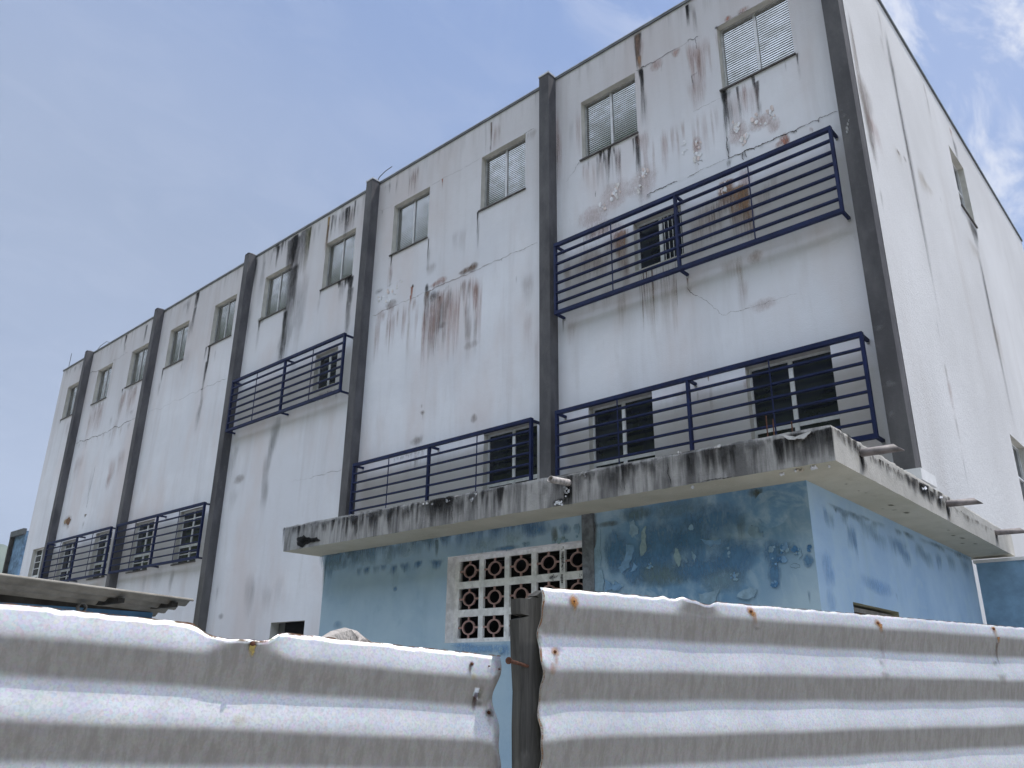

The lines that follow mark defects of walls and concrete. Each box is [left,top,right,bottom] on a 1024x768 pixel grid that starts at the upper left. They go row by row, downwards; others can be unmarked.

crack [647,111,838,195]
corrosion [718,168,750,220]
damp [276,227,312,343]
damp [686,445,734,470]
damp [774,427,865,467]
damp [332,496,453,532]
damp [554,475,572,506]
damp [906,474,951,518]
peeling [594,503,813,604]